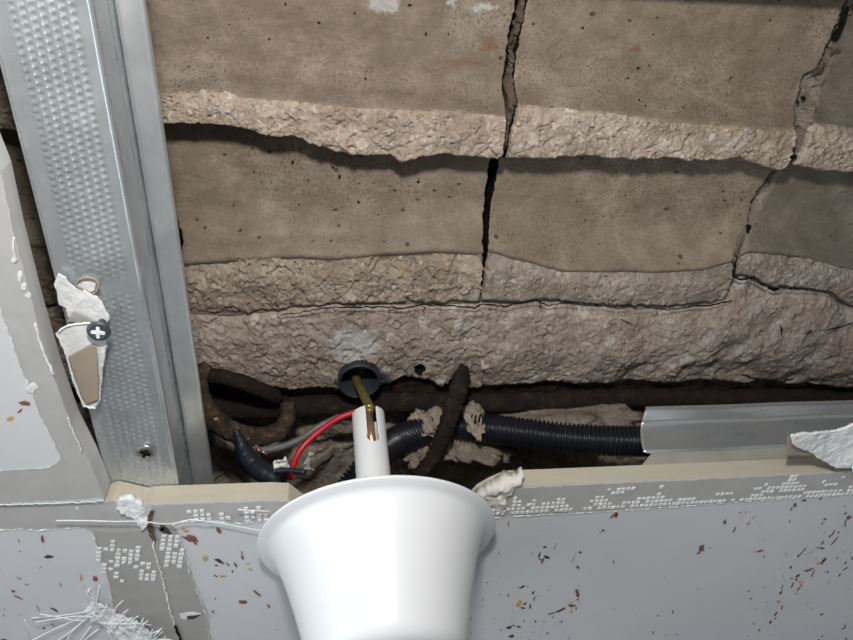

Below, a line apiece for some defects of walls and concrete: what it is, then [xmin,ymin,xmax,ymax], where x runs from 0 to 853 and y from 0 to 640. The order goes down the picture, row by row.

spalling [0,83,17,131]
spalling [159,89,853,173]
crack [280,0,733,326]
crack [176,219,184,250]
spalling [184,252,853,314]
crack [732,258,828,293]